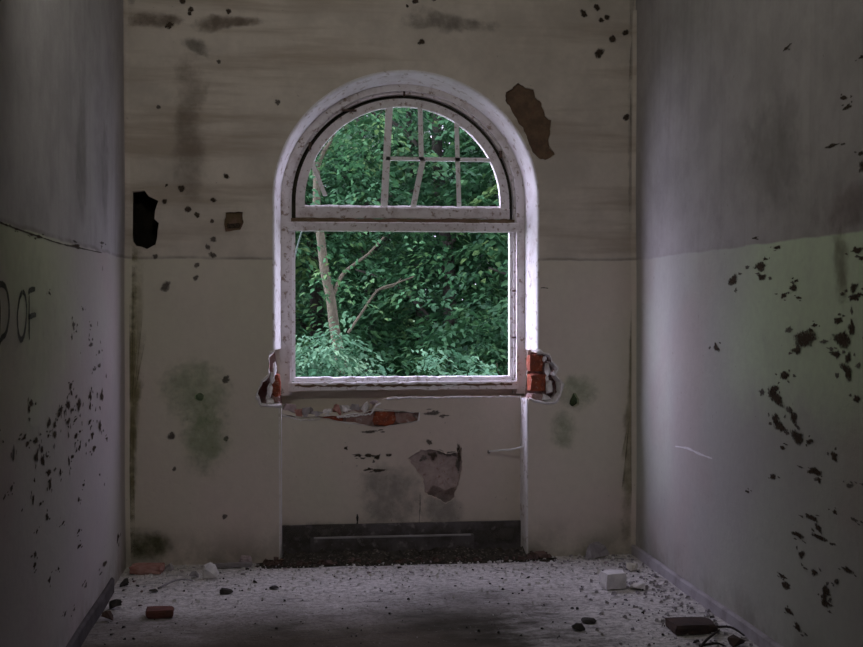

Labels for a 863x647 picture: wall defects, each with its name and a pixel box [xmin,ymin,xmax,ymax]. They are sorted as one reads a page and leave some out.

flaking render [504,81,555,162]
spalling [129,189,162,250]
flaking render [223,211,245,232]
peeling [728,245,780,292]
peeling [785,284,863,381]
flaking render [255,349,580,427]
flaking render [407,444,464,505]